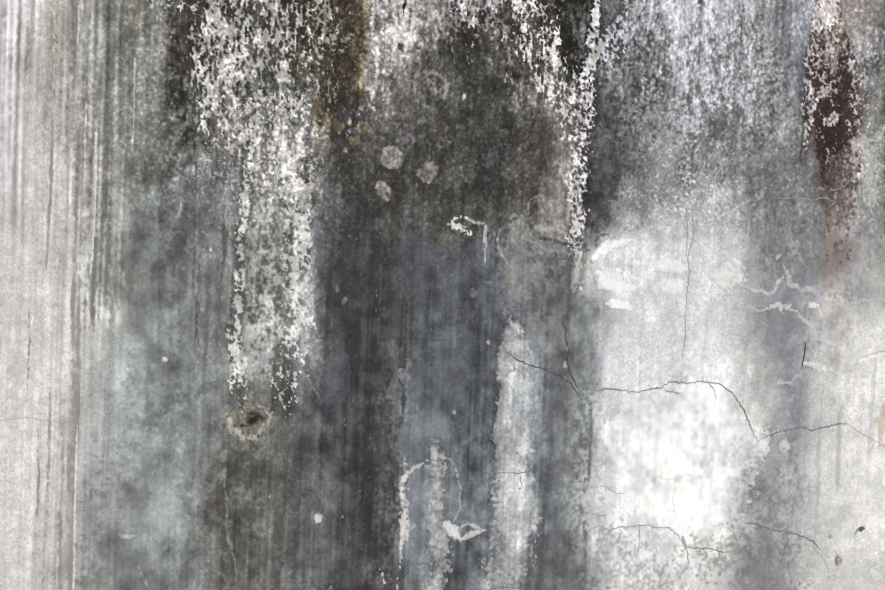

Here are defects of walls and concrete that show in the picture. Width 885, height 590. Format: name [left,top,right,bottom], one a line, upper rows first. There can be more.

rust [808,25,866,320]
water stain [33,392,52,590]
spalling [218,400,279,443]
water stain [45,0,712,590]
crack [509,321,883,446]
crack [580,470,830,590]
water stain [570,0,885,590]